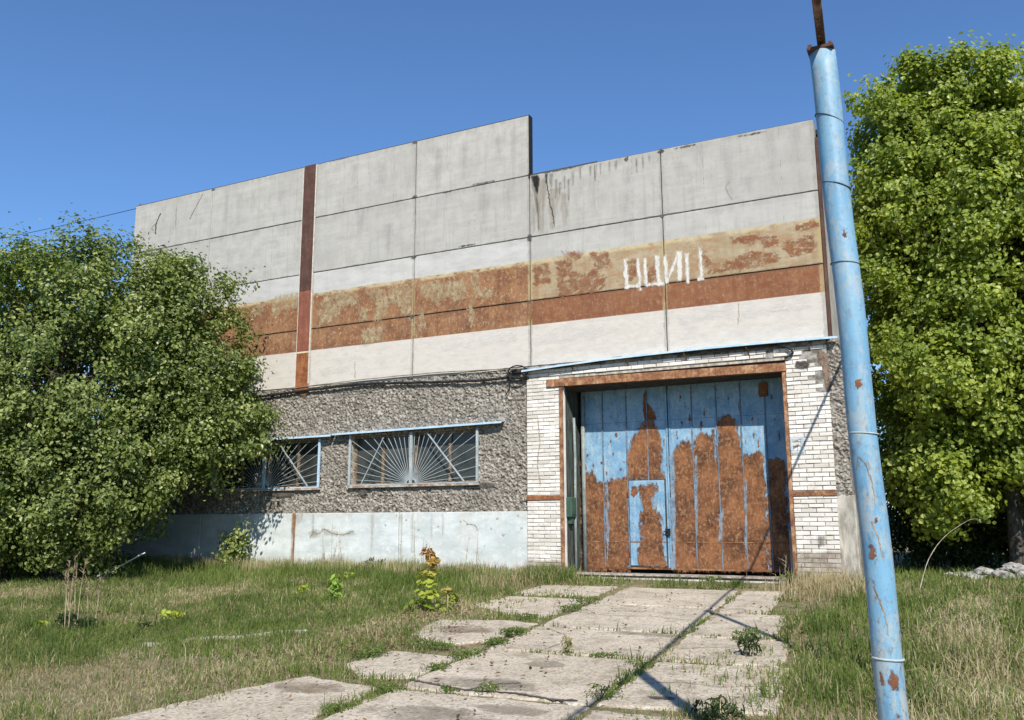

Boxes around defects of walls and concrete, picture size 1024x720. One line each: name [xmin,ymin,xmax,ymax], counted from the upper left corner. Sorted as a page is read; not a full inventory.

water stain [531,174,555,226]
corrosion [879,670,900,690]